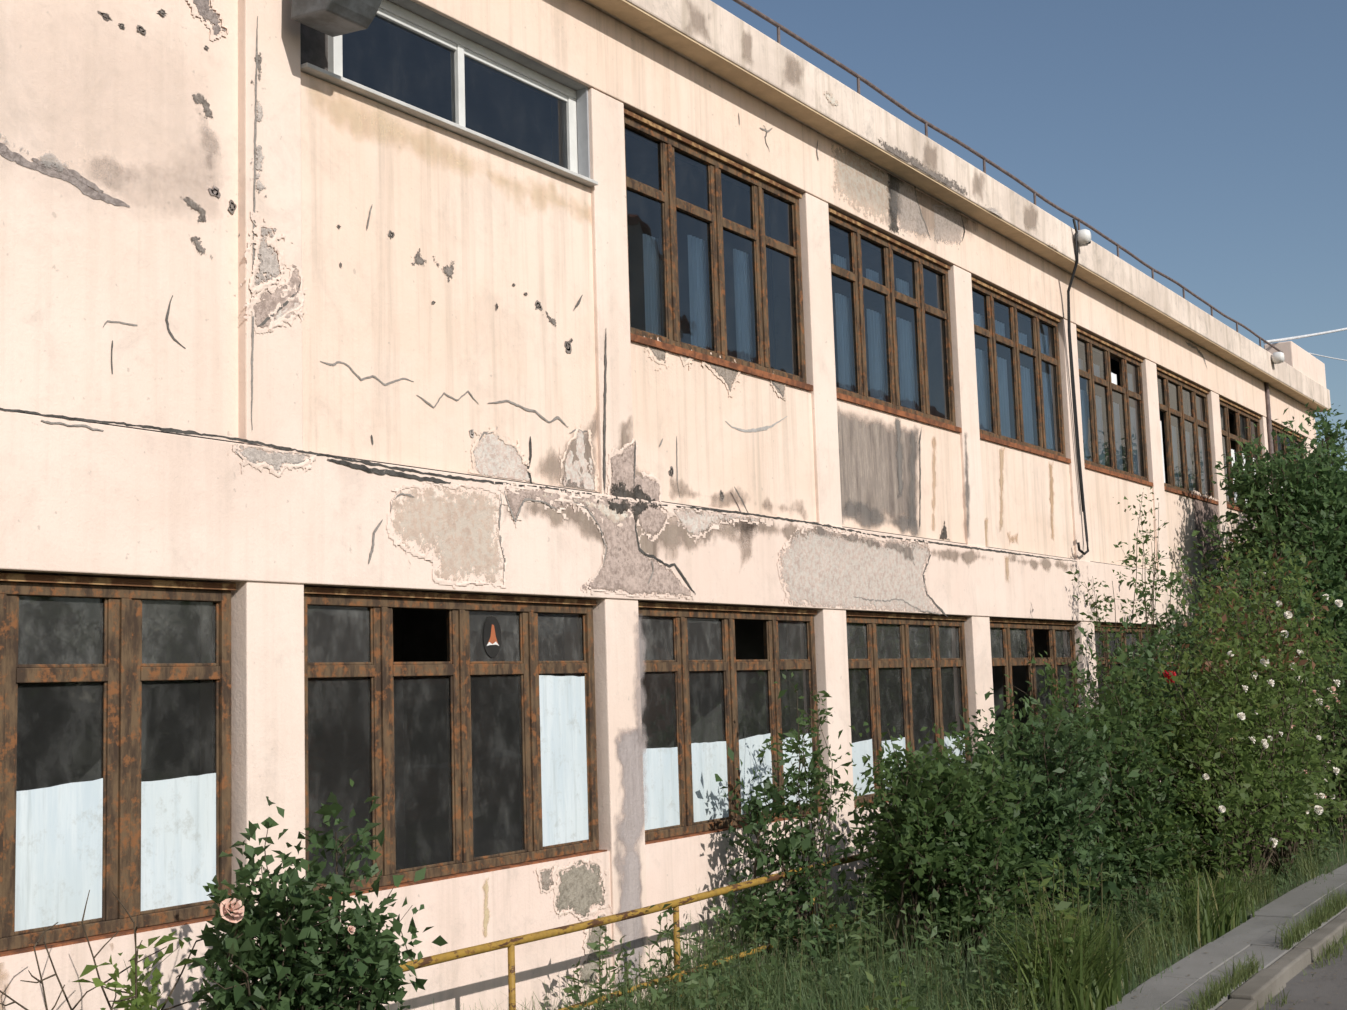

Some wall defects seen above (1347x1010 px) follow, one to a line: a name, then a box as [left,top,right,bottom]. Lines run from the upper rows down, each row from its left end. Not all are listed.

peeling [99,11,146,35]
flaking render [187,0,229,49]
peeling [192,92,218,151]
spalling [0,134,130,207]
spalling [181,145,309,334]
crack [0,16,1072,561]
peeling [770,380,786,401]
flaking render [369,334,773,600]
leakage [531,411,977,576]
flaking render [777,525,946,615]
leakage [1012,554,1072,570]
flaking render [533,858,612,995]